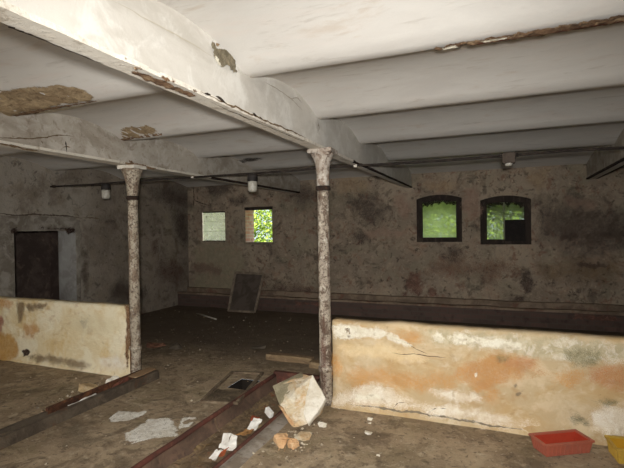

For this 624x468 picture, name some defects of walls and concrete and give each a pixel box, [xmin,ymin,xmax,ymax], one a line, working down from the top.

flaking render [434,15,624,51]
flaking render [211,42,237,73]
flaking render [131,67,197,97]
flaking render [0,84,100,117]
flaking render [121,125,162,141]
damp [0,332,127,372]
damp [330,350,624,442]
crack [350,402,522,430]